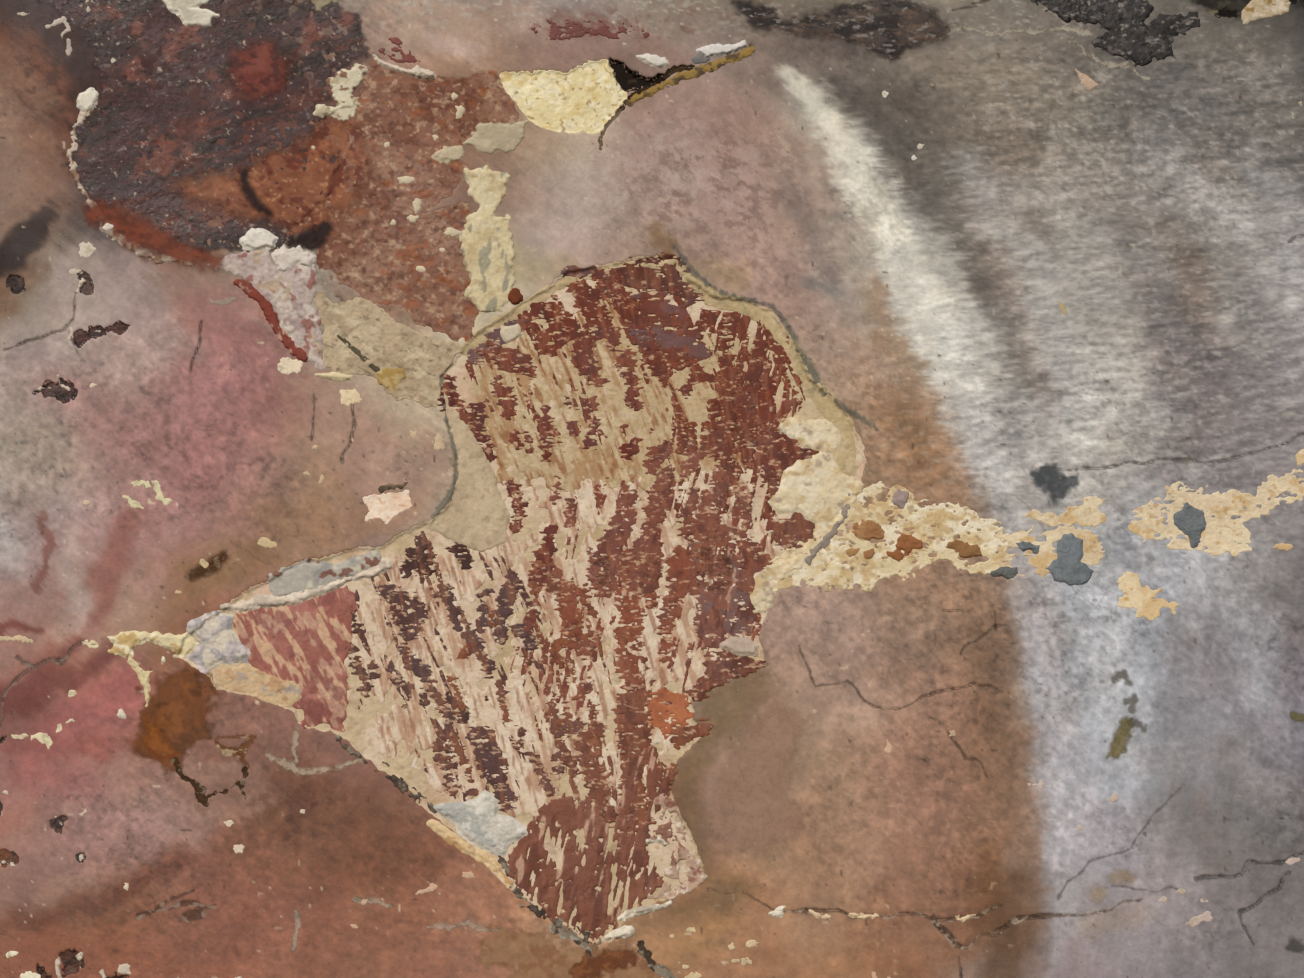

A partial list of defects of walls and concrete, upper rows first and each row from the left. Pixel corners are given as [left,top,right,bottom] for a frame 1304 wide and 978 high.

peeling [38,0,1106,950]
peeling [1128,449,1304,557]
peeling [1117,571,1179,621]
crack [0,642,82,744]
peeling [11,719,75,750]
corrosion [133,668,217,771]
peeling [1186,899,1212,927]
crack [548,924,594,958]
crack [637,940,677,978]
peeling [728,940,759,966]